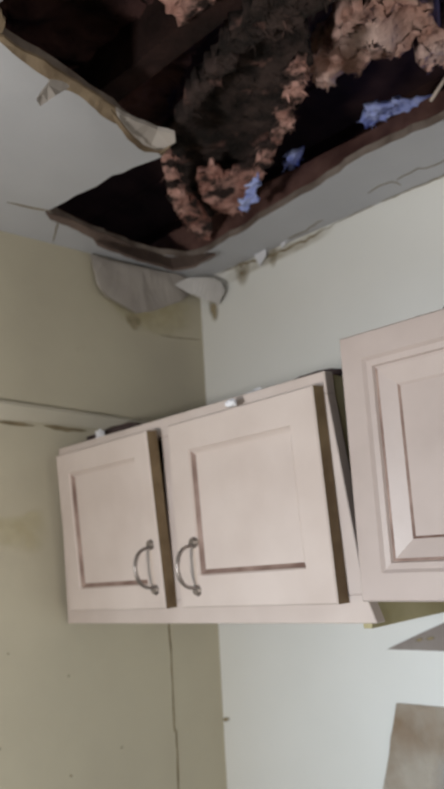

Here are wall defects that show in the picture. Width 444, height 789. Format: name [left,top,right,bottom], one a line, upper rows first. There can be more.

peeling [254,249,267,266]
crack [168,623,179,789]